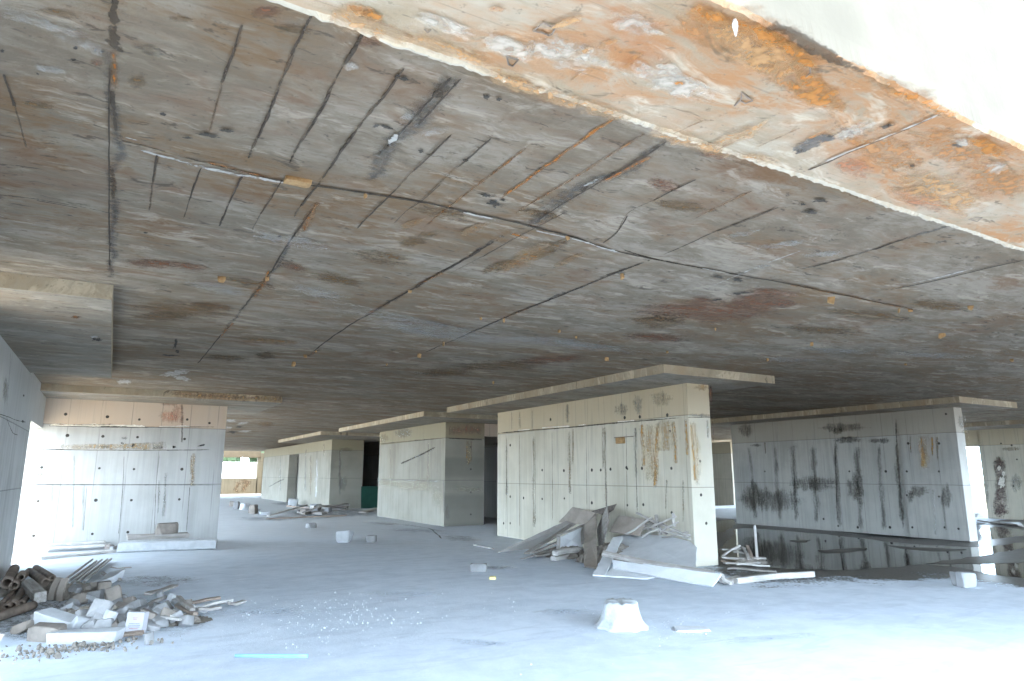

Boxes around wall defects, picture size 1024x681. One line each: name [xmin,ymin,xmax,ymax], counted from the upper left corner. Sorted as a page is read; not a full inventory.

rust [334,5,483,65]
rust [679,7,956,117]
crack [3,0,364,275]
rust [494,69,621,197]
rust [518,121,762,212]
crack [294,69,1023,357]
rust [837,131,1020,211]
rust [641,425,667,490]
water stain [743,424,862,524]